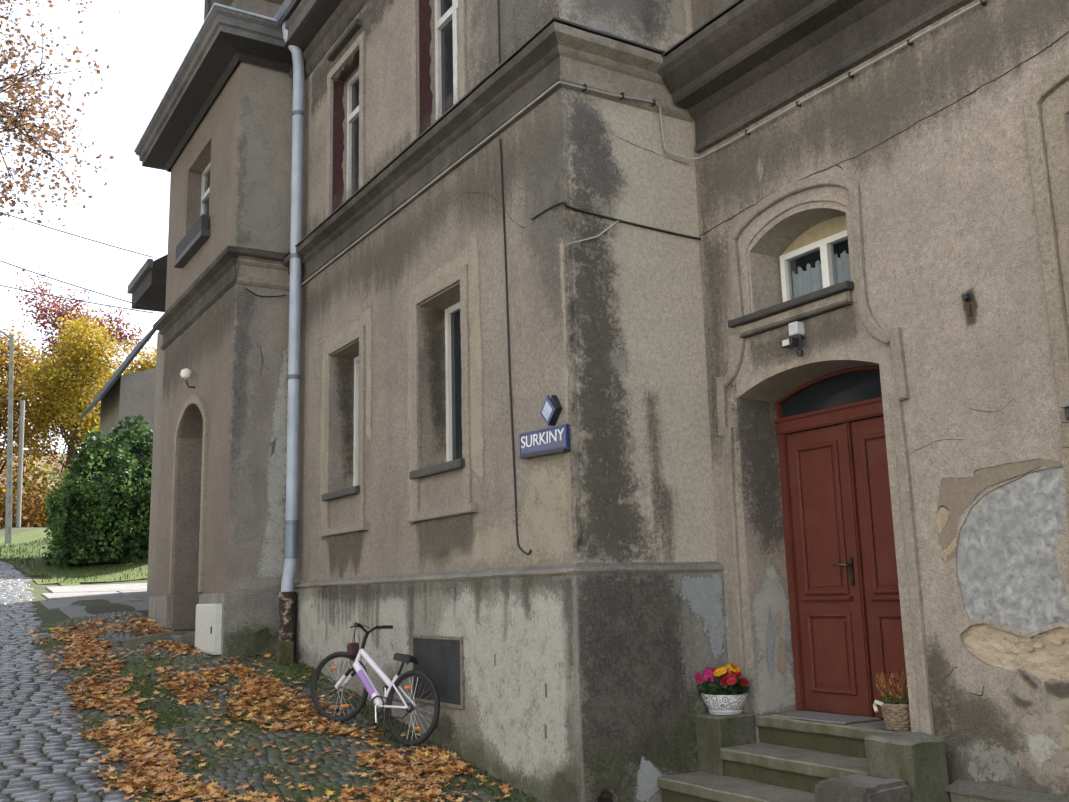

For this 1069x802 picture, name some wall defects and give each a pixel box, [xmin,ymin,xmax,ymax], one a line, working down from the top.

damp [471,0,670,80]
damp [301,85,697,775]
peeling [751,564,796,714]
peeling [935,458,1069,770]
peeling [591,757,665,802]